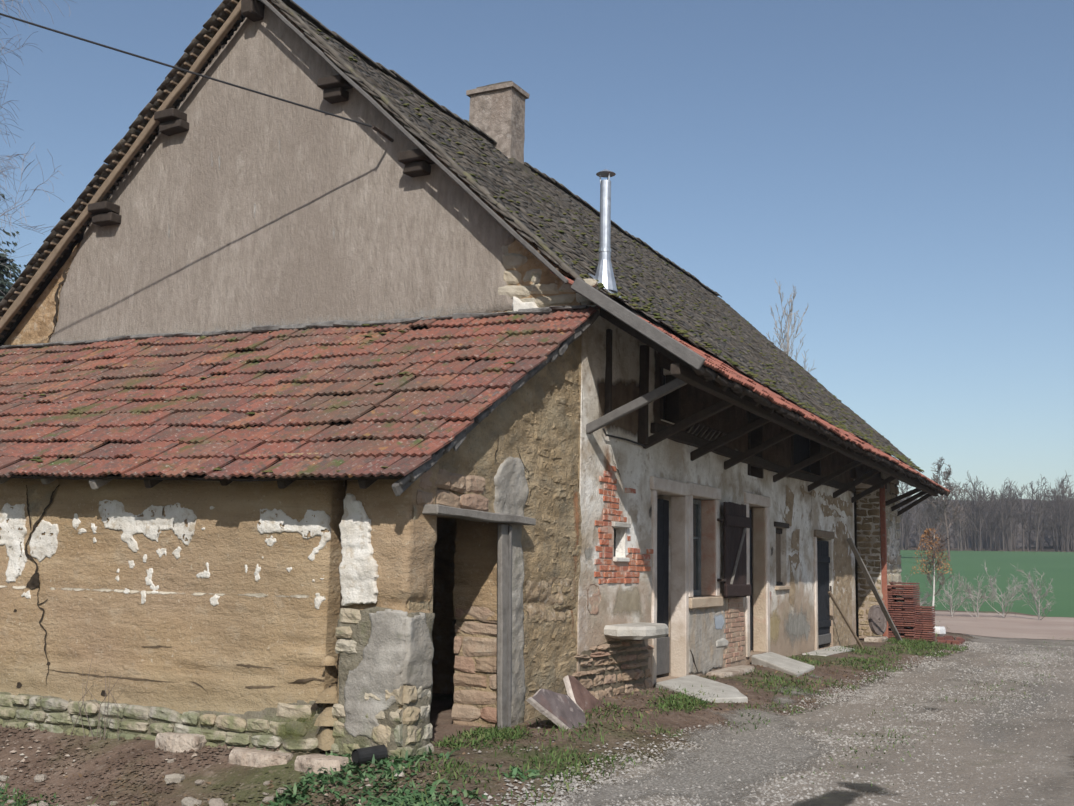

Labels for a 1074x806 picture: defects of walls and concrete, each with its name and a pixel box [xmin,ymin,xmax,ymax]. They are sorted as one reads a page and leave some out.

peeling [0,503,59,583]
crack [25,483,60,678]
peeling [72,500,205,604]
peeling [245,480,379,620]
spalling [523,465,654,622]
spalling [783,485,852,607]
spalling [314,655,339,751]